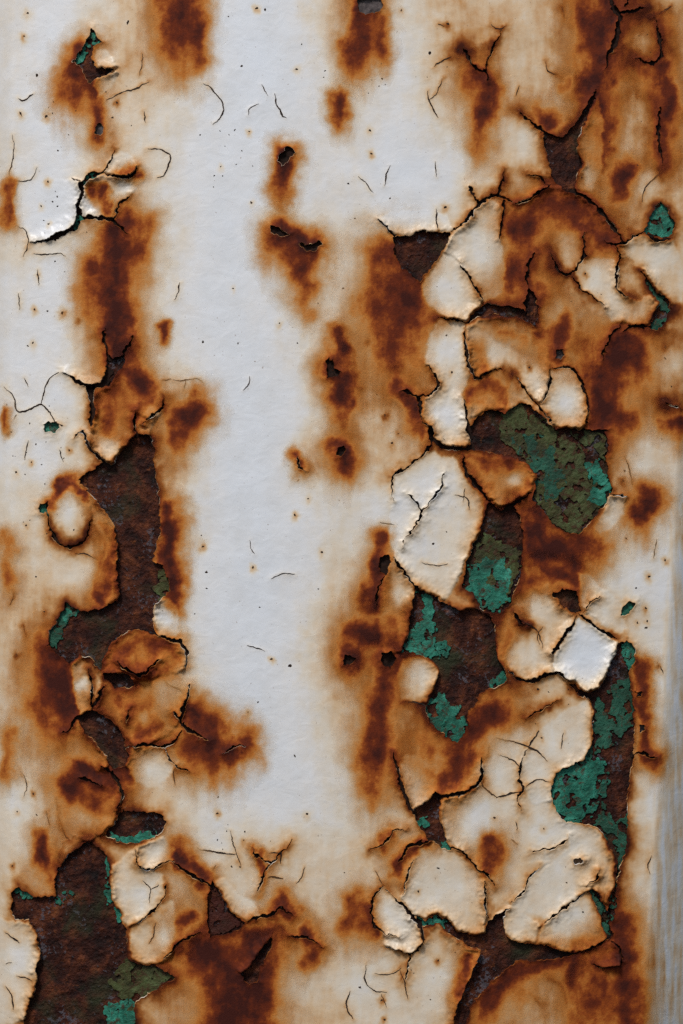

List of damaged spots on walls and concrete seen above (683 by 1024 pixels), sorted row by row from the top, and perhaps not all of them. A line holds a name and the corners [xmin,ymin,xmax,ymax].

crack [4,328,134,469]
peeling [14,151,137,243]
rust [68,161,220,470]
rust [255,136,441,489]
crack [435,175,670,305]
rust [461,0,683,475]
peeling [549,202,683,331]
peeling [0,336,188,1024]
rust [0,470,267,894]
crack [133,831,317,958]
crack [345,596,623,1018]
peeling [372,200,645,1024]